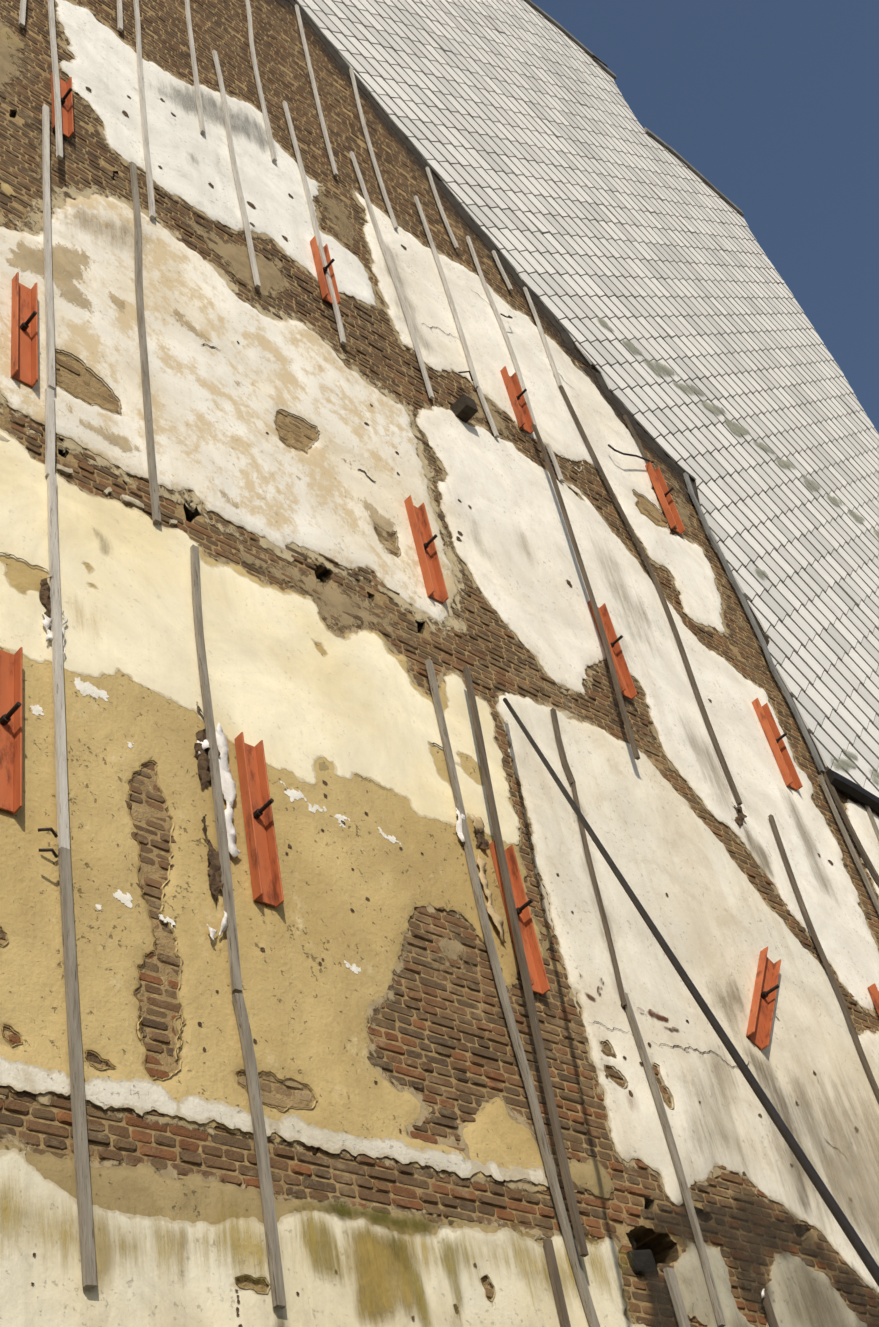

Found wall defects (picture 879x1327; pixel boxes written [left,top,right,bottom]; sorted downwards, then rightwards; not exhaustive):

flaking render [0,162,728,759]
peeling [0,647,879,1327]
crack [588,1021,758,1069]
damp [219,1221,264,1266]
damp [304,1219,340,1273]
damp [352,1227,469,1326]